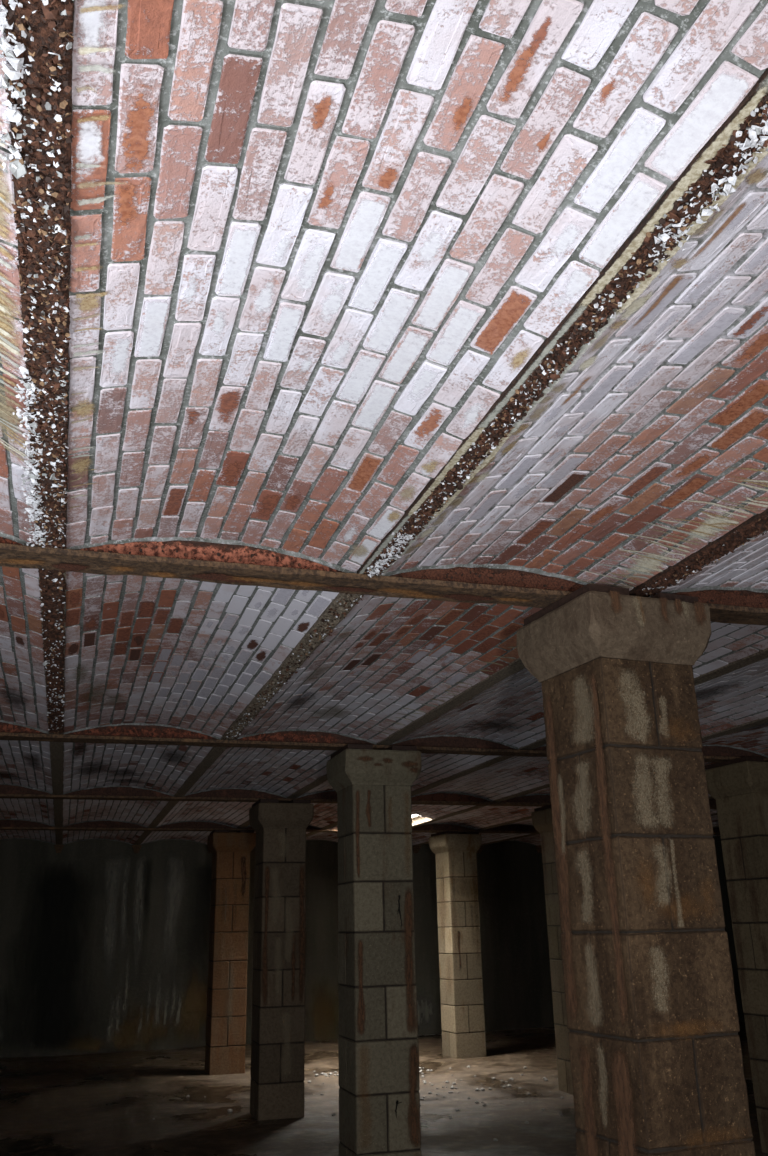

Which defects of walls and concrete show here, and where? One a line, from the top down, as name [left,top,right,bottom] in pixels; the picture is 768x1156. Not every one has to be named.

water stain [105,861,144,957]
rust [404,890,420,1147]